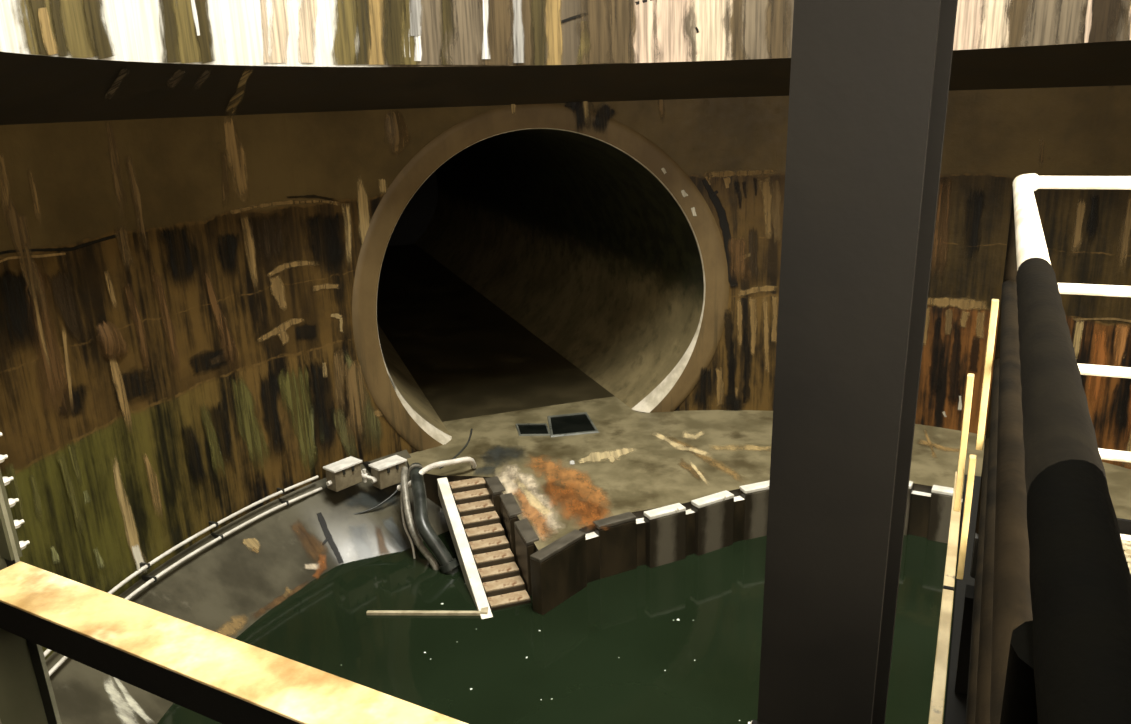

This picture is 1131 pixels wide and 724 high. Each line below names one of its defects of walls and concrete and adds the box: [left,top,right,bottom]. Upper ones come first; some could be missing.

leakage [222,70,251,202]
leakage [0,154,85,346]
leakage [218,214,285,281]
leakage [308,179,370,264]
leakage [60,385,85,415]
leakage [113,370,151,408]
leakage [182,350,383,481]
leakage [1109,327,1131,427]
leakage [6,465,42,519]
leakage [58,445,88,528]
leakage [144,453,161,512]
corrosion [500,458,606,536]